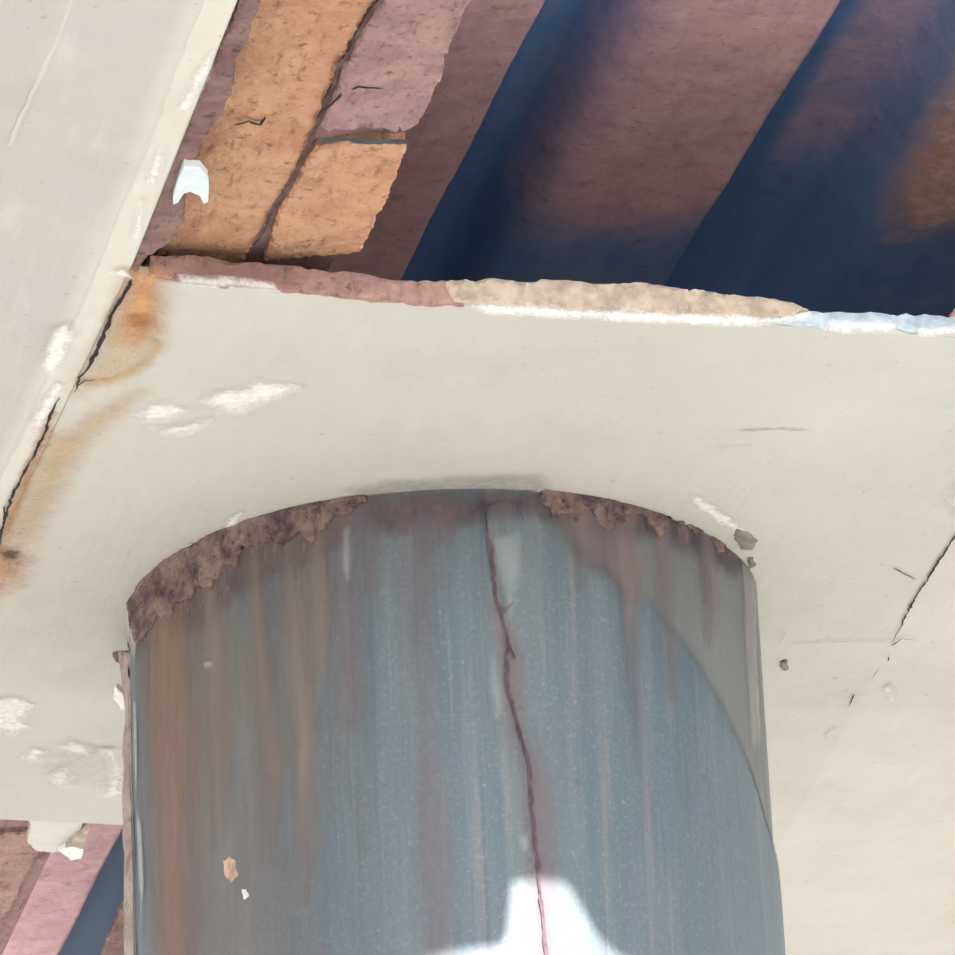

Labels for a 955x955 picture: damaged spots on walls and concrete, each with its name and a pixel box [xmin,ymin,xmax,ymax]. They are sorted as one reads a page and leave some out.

peeling [179,55,211,110]
peeling [173,159,209,205]
peeling [44,326,71,372]
rust [103,273,158,382]
peeling [180,277,276,290]
peeling [445,278,955,335]
peeling [35,384,62,425]
crack [0,276,133,545]
rust [126,489,751,647]
crack [888,536,955,661]
crack [477,496,549,955]
peeling [614,496,778,859]